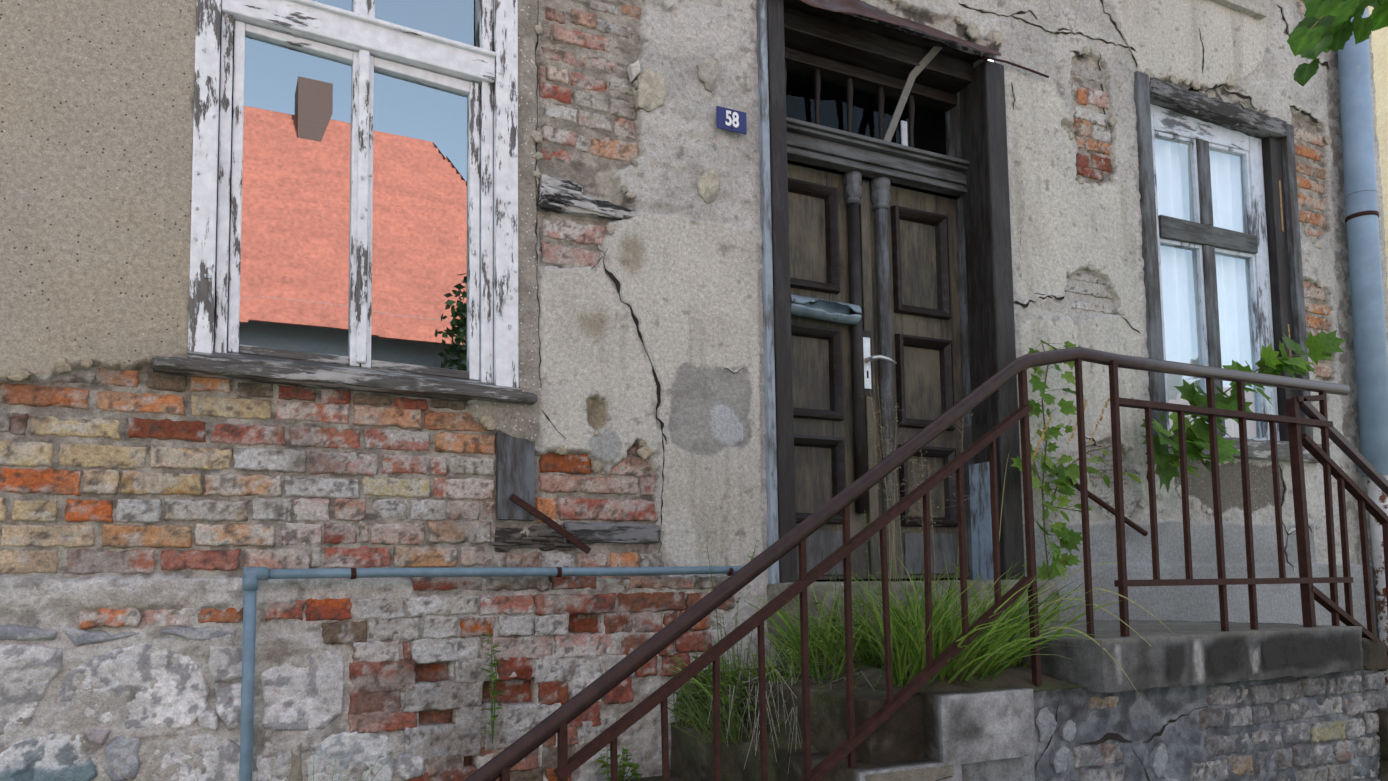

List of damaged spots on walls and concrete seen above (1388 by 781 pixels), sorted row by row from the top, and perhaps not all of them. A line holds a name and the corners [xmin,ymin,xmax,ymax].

flaking render [514,0,642,179]
flaking render [541,217,615,268]
crack [1014,180,1065,308]
crack [958,0,1138,148]
flaking render [1068,46,1118,184]
flaking render [1064,261,1125,315]
flaking render [1293,107,1332,249]
flaking render [1303,279,1334,337]
crack [591,245,669,553]
flaking render [0,356,735,781]